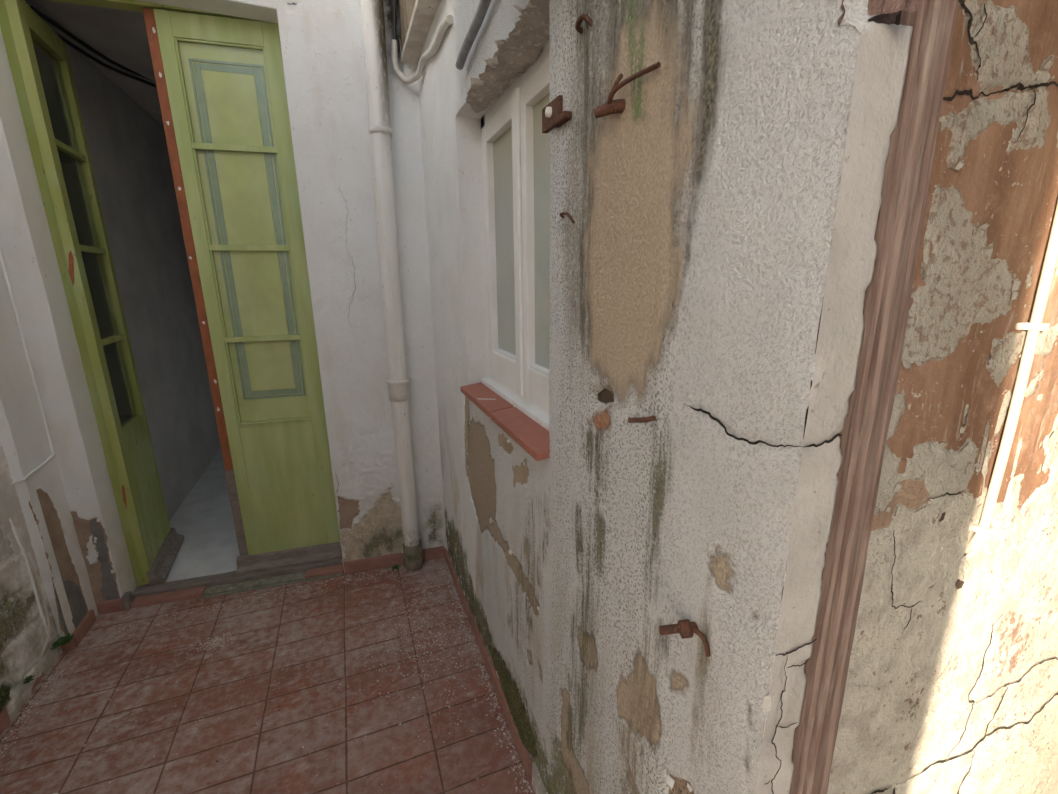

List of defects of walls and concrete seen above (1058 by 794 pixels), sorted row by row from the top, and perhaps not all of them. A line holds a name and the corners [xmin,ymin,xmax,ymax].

leakage [608,0,721,183]
crack [943,0,1058,144]
leakage [580,173,594,354]
peeling [867,0,1058,531]
peeling [29,489,120,636]
flaking render [338,488,404,563]
peeling [465,396,540,615]
leakage [508,535,548,649]
leakage [567,430,605,750]
crack [687,405,842,447]
crack [891,530,920,629]
crack [871,619,1058,794]